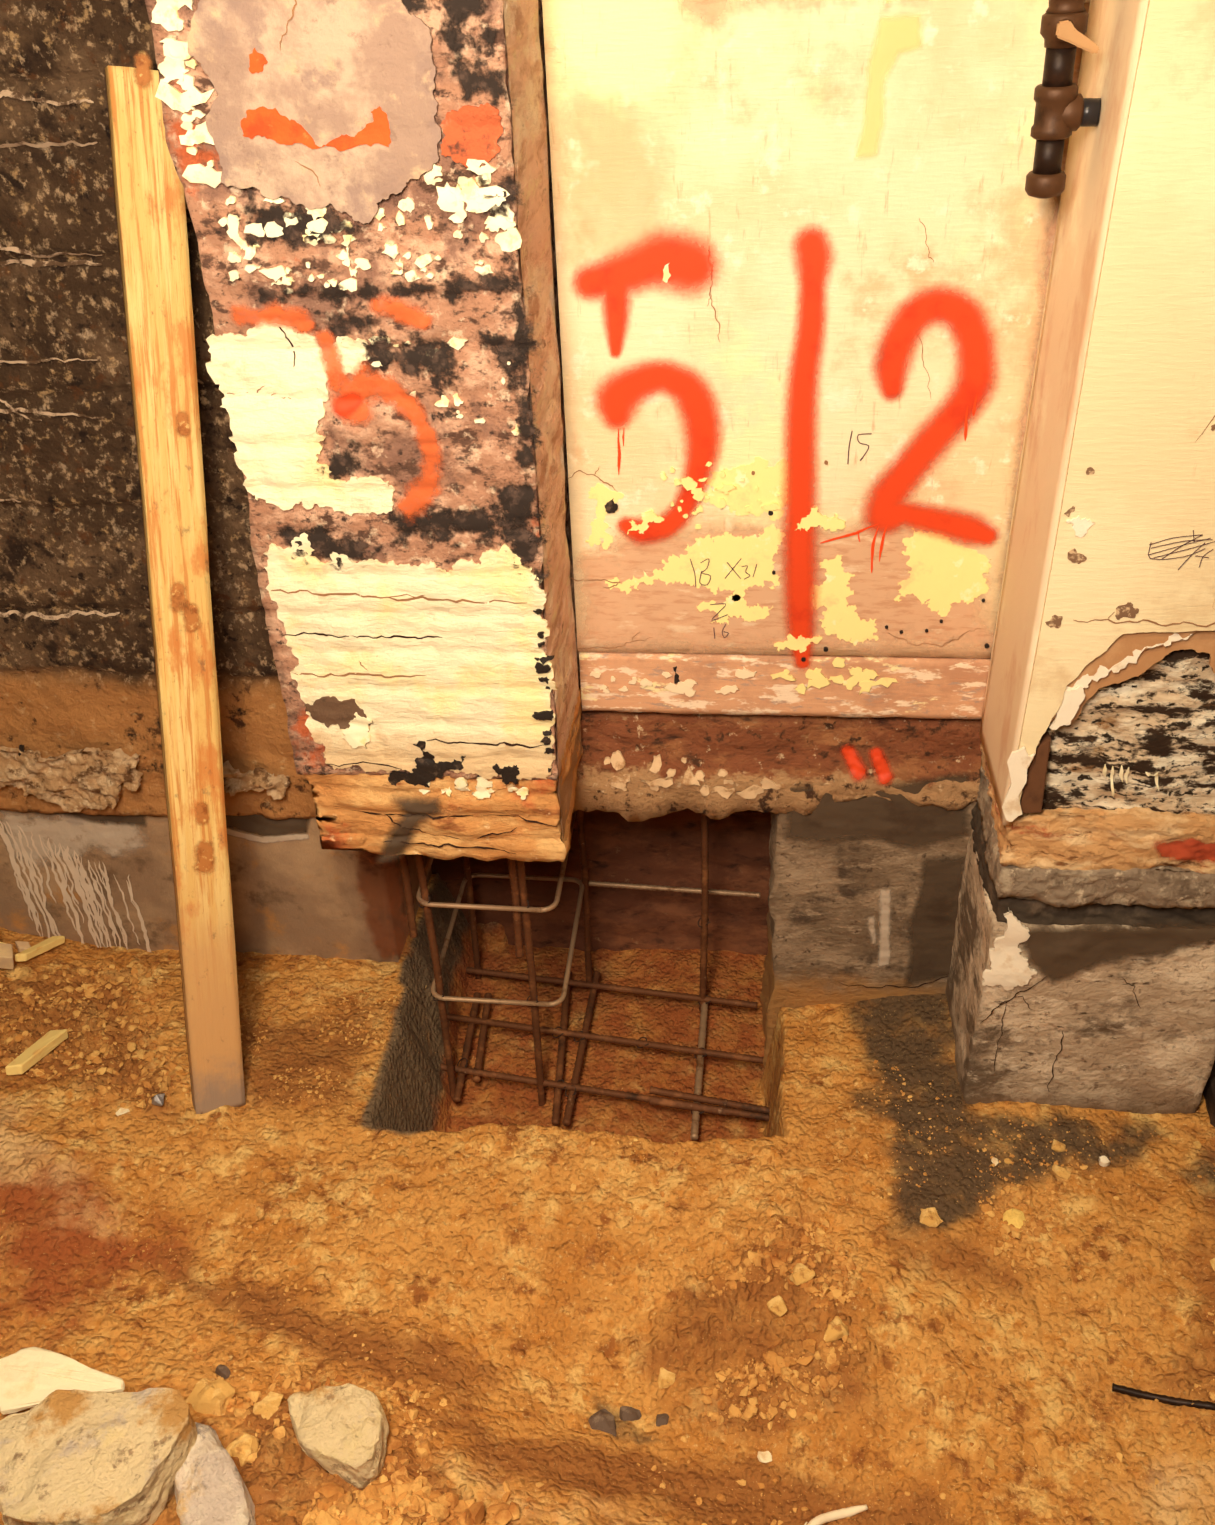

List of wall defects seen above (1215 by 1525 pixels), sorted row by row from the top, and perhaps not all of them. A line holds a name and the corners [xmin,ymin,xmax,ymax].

spalling [151,0,522,294]
peeling [447,337,469,350]
peeling [434,393,486,423]
peeling [581,457,994,697]
spalling [1045,615,1063,628]
peeling [263,533,558,800]
spalling [1042,649,1215,815]
spalling [0,744,143,812]
spalling [223,760,291,800]
water stain [0,812,151,952]
spalling [982,907,1037,991]
crack [1047,1031,1064,1091]